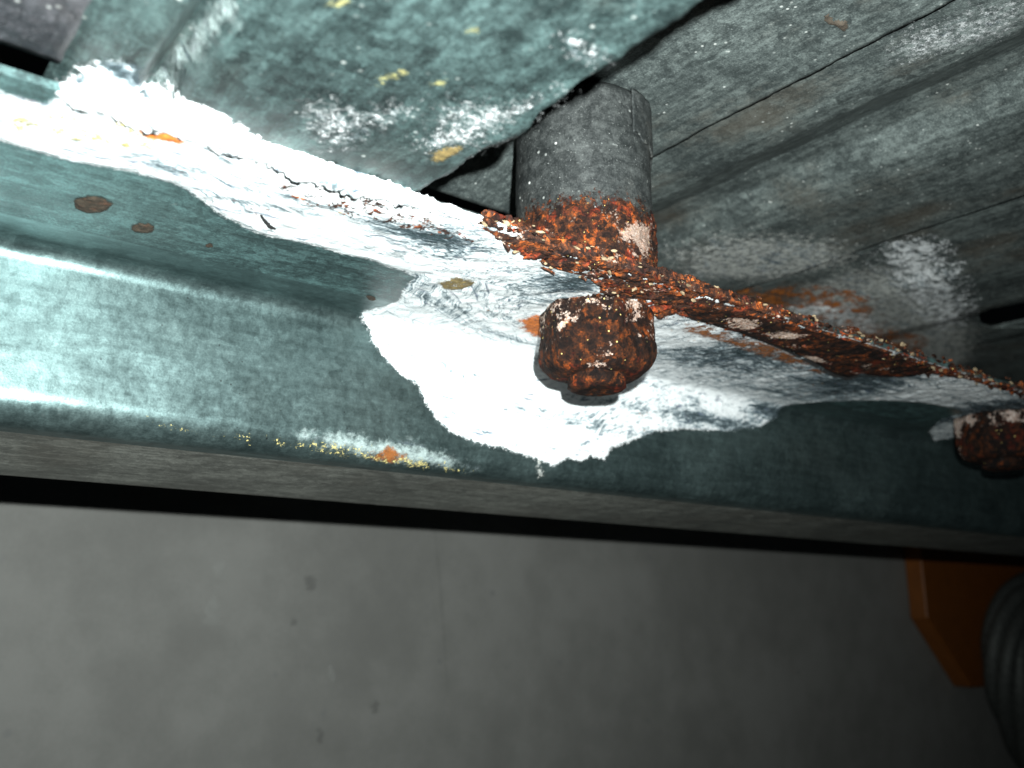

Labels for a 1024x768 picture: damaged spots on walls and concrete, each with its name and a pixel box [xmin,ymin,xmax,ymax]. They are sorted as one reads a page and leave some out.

leakage [434,108,499,148]
rust [0,58,1024,467]
leakage [441,277,474,290]
leakage [300,442,429,468]